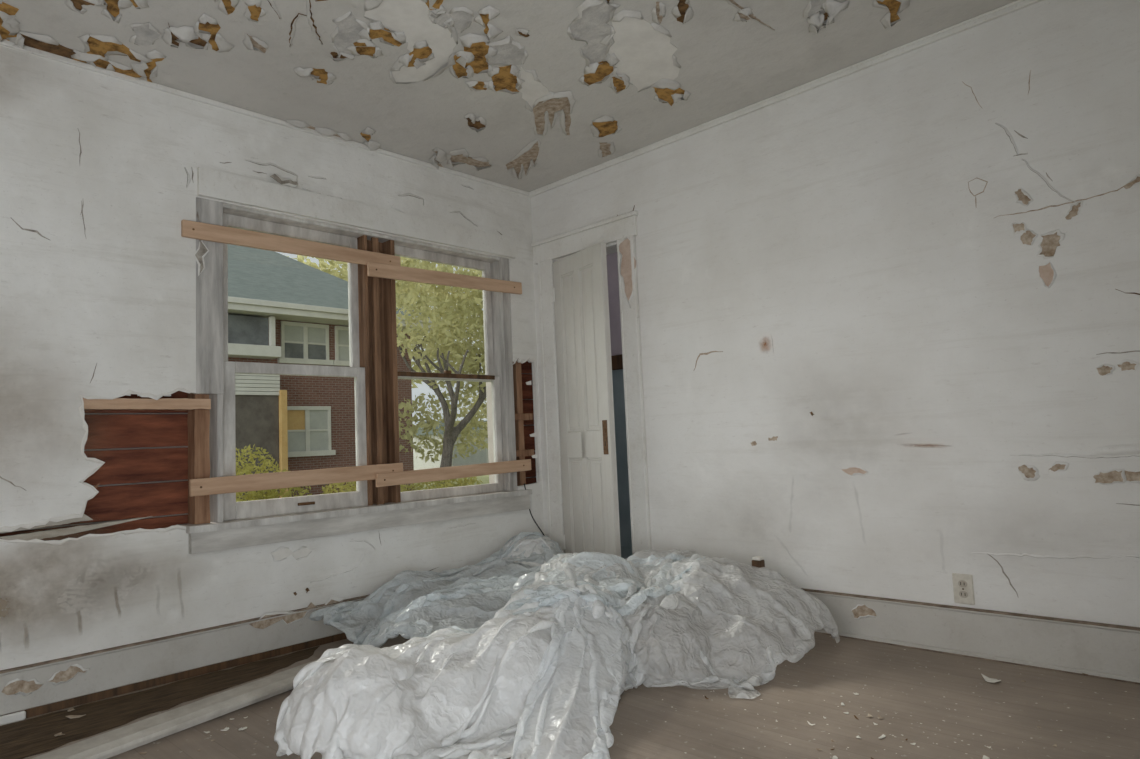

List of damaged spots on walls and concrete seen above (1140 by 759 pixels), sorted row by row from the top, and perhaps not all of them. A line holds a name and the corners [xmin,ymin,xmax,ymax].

peeling [803,0,850,34]
peeling [872,0,910,29]
peeling [0,0,268,82]
peeling [286,0,694,180]
peeling [1015,188,1033,206]
peeling [1123,175,1140,189]
peeling [1011,201,1083,288]
flaking render [0,388,191,545]
peeling [1018,461,1069,481]
peeling [1093,468,1140,484]
peeling [0,646,319,759]